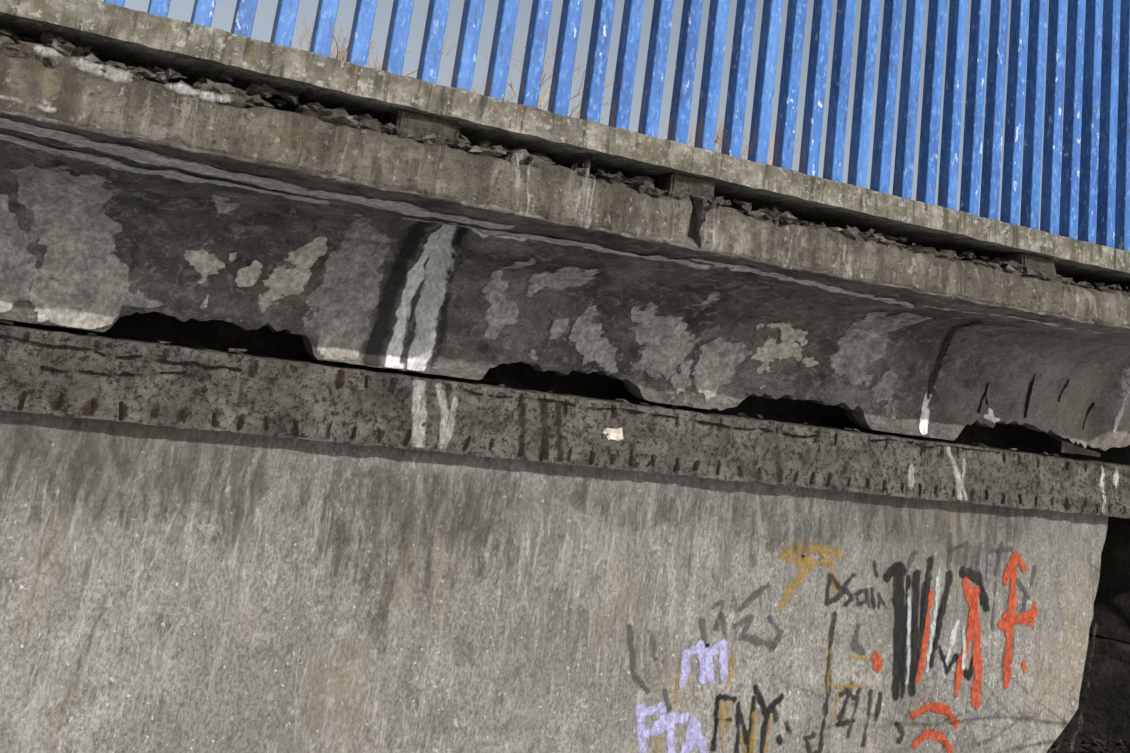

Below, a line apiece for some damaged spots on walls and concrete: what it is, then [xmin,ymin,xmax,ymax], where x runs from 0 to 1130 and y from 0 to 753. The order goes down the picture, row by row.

peeling [0,164,398,361]
leakage [0,46,1101,448]
peeling [481,258,599,340]
rust [82,398,98,416]
crack [0,334,242,376]
rust [336,370,345,387]
crack [462,388,820,438]
peeling [448,301,932,432]
crack [1025,374,1036,418]
leakage [1114,367,1130,432]
rust [611,454,657,468]
spalling [908,423,1130,464]